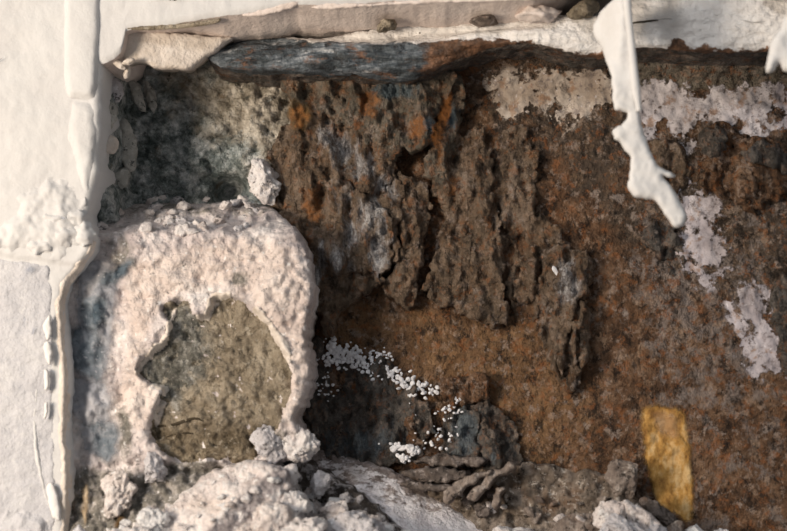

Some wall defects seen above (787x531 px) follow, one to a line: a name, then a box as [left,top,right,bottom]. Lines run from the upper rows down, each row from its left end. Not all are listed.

peeling [112,18,234,79]
corrosion [288,99,310,131]
peeling [640,78,787,155]
corrosion [645,121,787,216]
peeling [266,66,613,471]
corrosion [641,219,687,277]
peeling [674,180,733,292]
spalling [134,291,292,463]
water stain [316,336,440,404]
corrosion [769,272,787,375]
water stain [378,397,464,464]
corrosion [642,406,693,520]